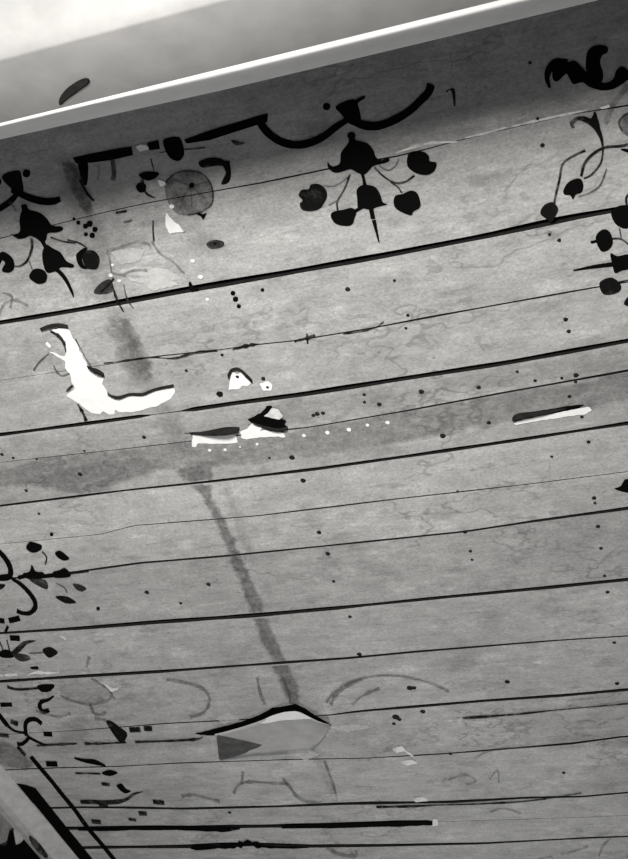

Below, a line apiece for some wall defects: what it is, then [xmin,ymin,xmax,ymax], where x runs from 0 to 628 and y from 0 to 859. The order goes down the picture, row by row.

peeling [33,323,175,415]
peeling [216,367,272,397]
peeling [189,406,288,452]
peeling [512,405,592,425]